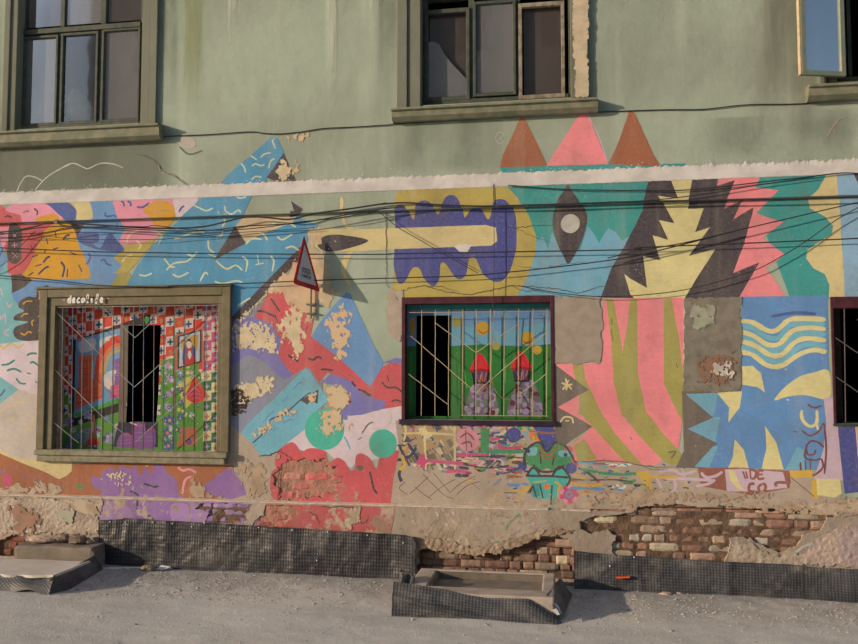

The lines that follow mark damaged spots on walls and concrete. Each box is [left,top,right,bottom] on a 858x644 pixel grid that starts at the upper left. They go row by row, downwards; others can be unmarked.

peeling [572,0,589,97]
peeling [276,159,301,182]
peeling [689,302,716,330]
peeling [710,361,735,378]
peeling [231,375,274,419]
peeling [251,405,297,437]
peeling [308,384,353,438]
spalling [189,454,343,527]
flaking render [0,480,103,556]
peeling [342,506,361,530]
spalling [417,486,858,586]